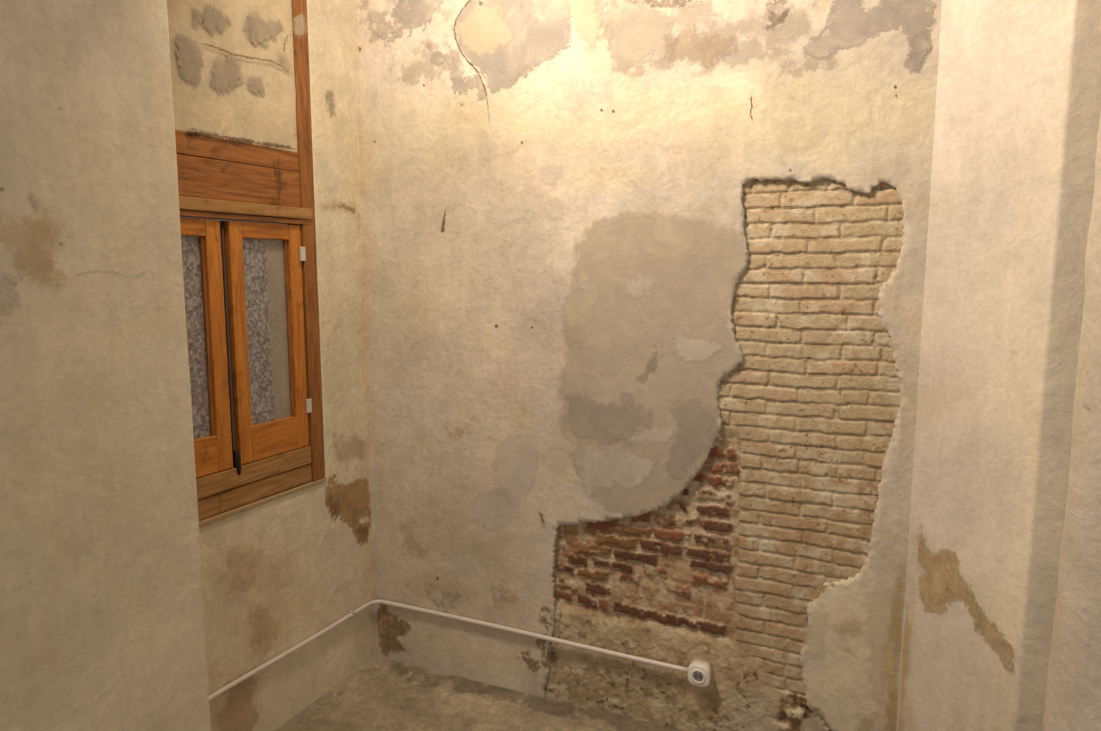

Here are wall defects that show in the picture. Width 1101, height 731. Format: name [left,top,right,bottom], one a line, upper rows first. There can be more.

peeling [366,0,443,47]
crack [454,0,491,126]
peeling [426,0,601,106]
peeling [630,0,702,8]
peeling [765,0,789,31]
peeling [803,0,936,73]
flaking render [545,178,905,731]